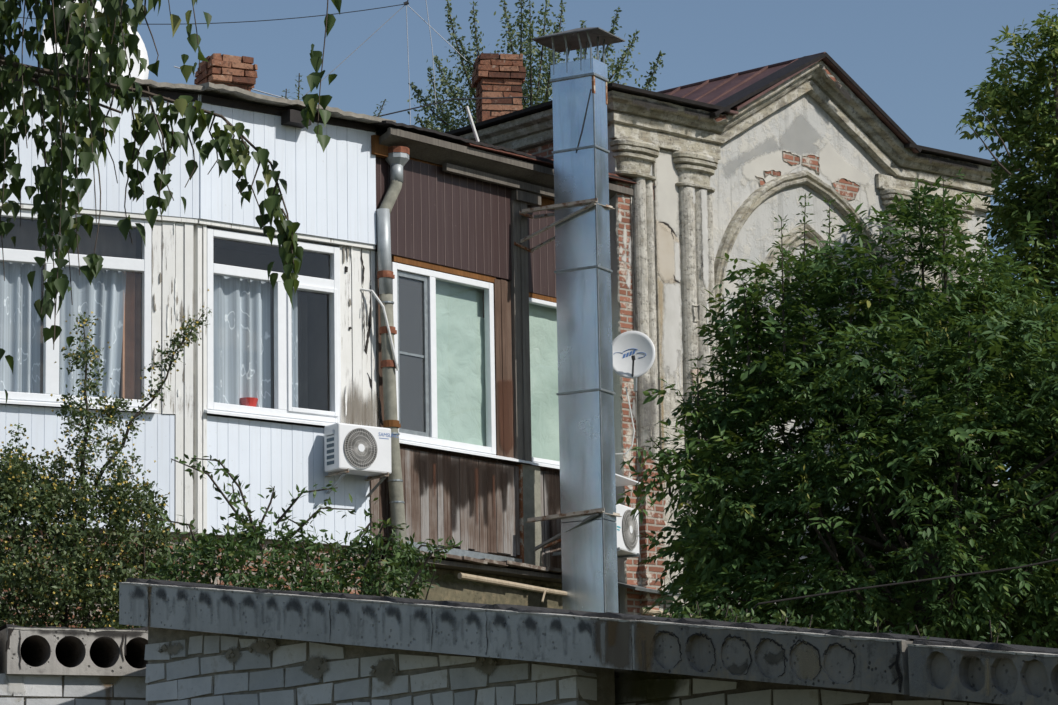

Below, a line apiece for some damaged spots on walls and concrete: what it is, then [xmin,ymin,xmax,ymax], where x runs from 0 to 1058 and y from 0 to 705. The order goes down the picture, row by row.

peeling [742,140,876,208]
spalling [616,181,635,335]
leakage [415,450,516,530]
leakage [544,470,561,538]
spalling [620,376,667,616]
leakage [135,586,186,600]
leakage [199,593,254,606]
leakage [267,598,323,614]
leakage [387,607,400,622]
leakage [578,617,631,669]